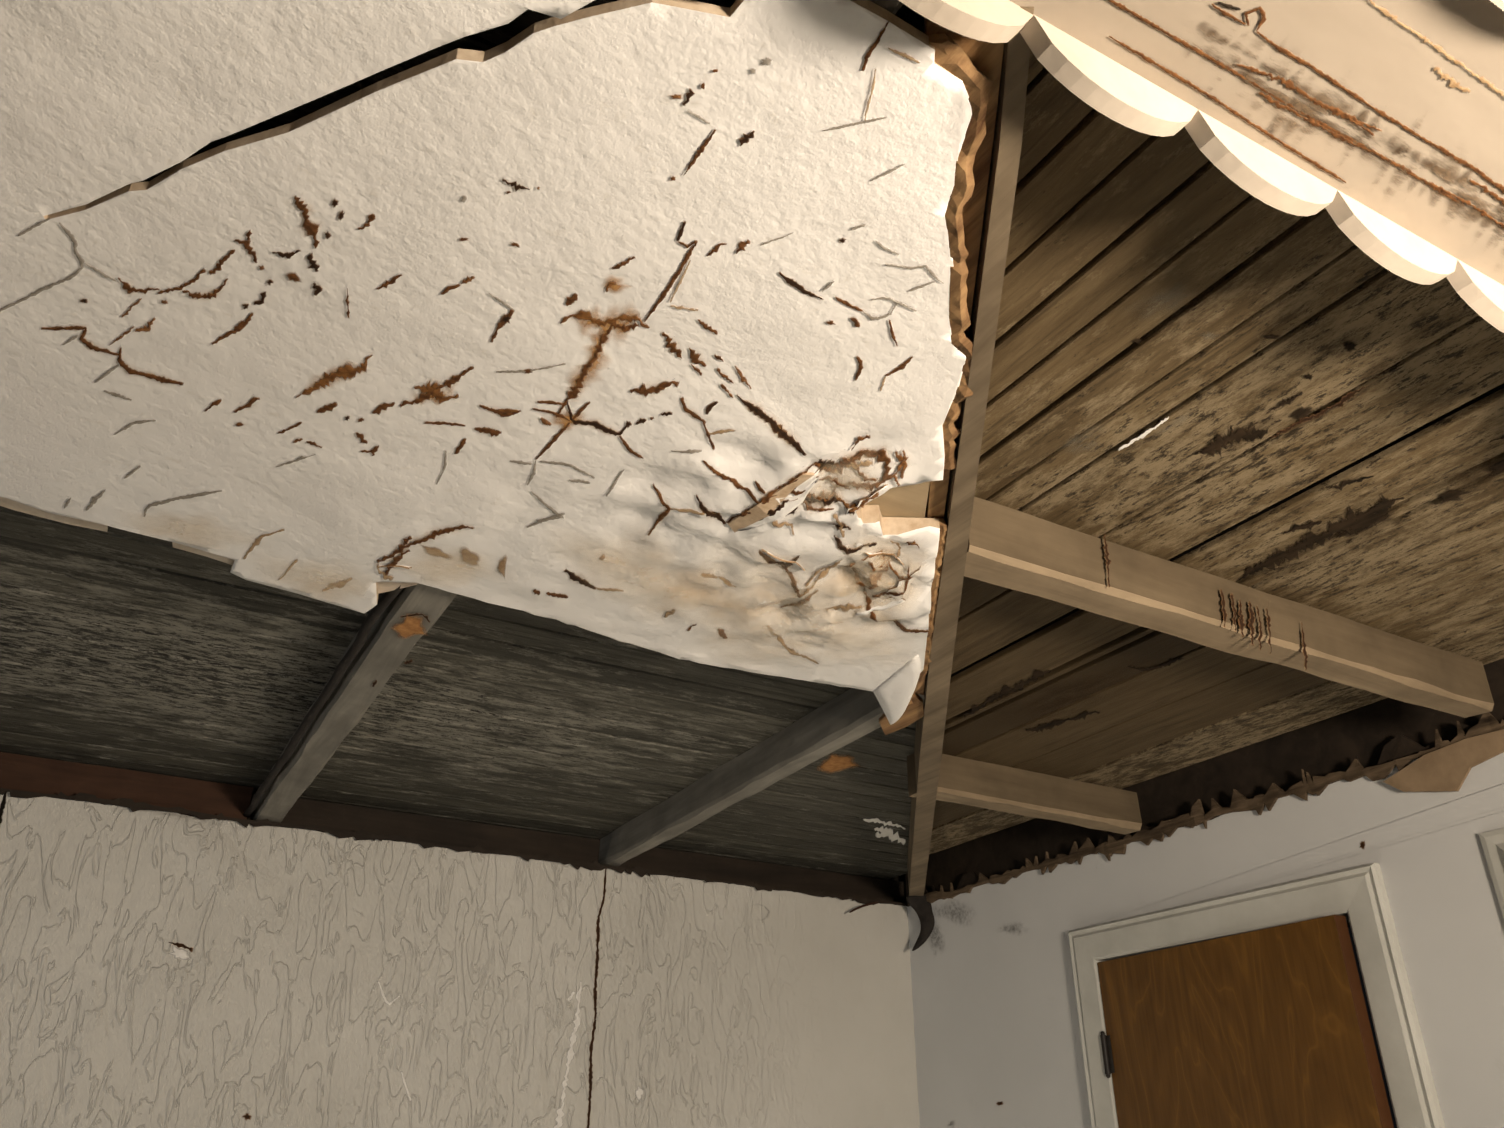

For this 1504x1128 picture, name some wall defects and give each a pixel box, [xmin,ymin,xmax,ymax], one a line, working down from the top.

peeling [1193,29,1504,235]
rust [605,279,622,292]
rust [295,355,373,398]
rust [400,366,474,407]
rust [556,310,650,418]
peeling [1119,417,1169,451]
peeling [726,435,921,622]
peeling [377,525,474,581]
spalling [820,755,857,772]
crack [0,792,8,824]
peeling [863,818,906,845]
crack [587,868,607,1128]